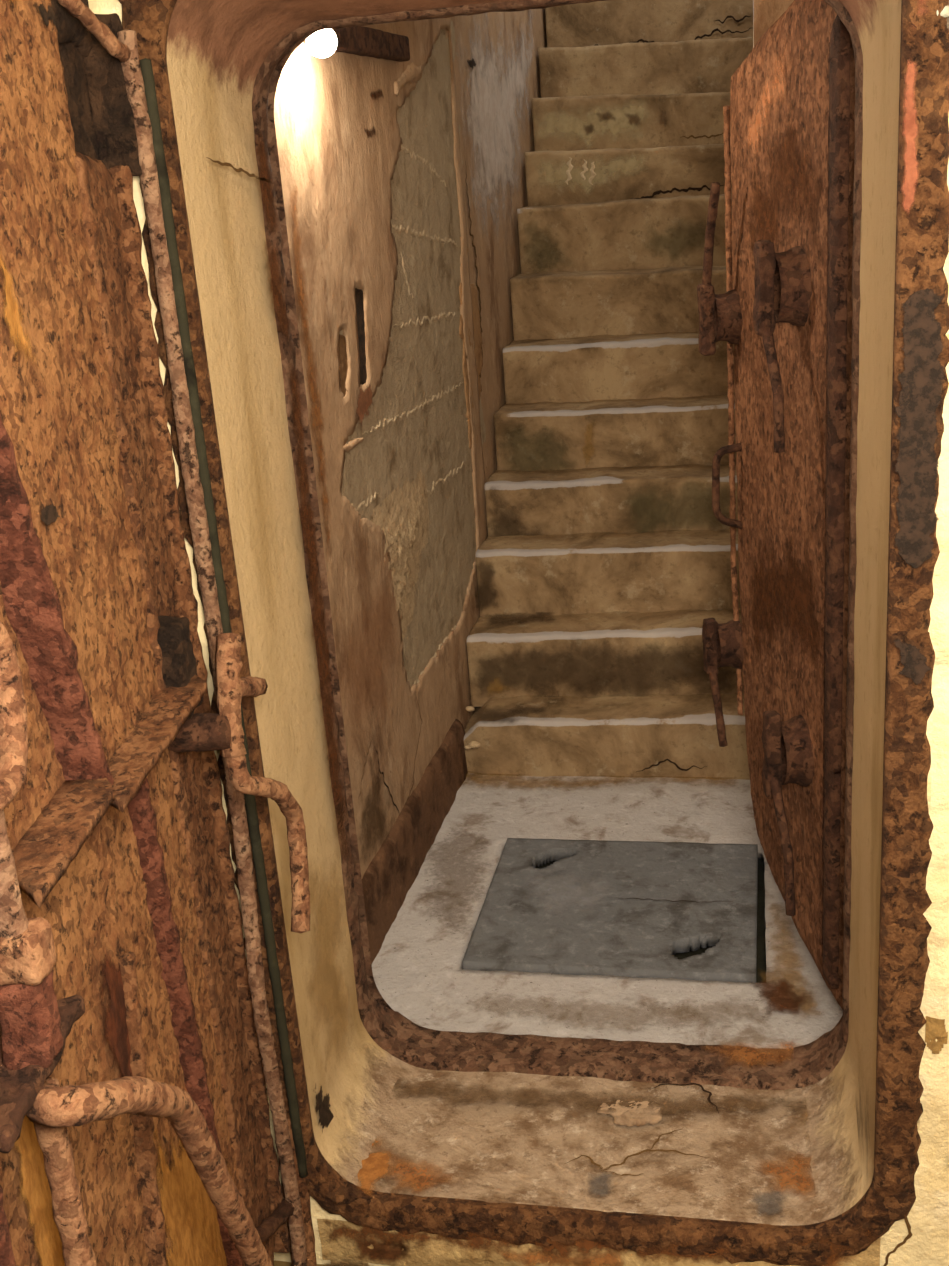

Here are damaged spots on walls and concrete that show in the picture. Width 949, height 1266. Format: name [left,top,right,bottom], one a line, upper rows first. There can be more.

damp [467,30,533,222]
rust [748,63,785,151]
spalling [339,288,373,430]
rust [257,137,349,853]
rust [722,1042,798,1065]
rust [313,1084,334,1132]
rust [154,1131,227,1266]
rust [357,1139,447,1193]
rust [762,1157,814,1193]
rust [326,1221,727,1266]
crack [883,1217,912,1266]